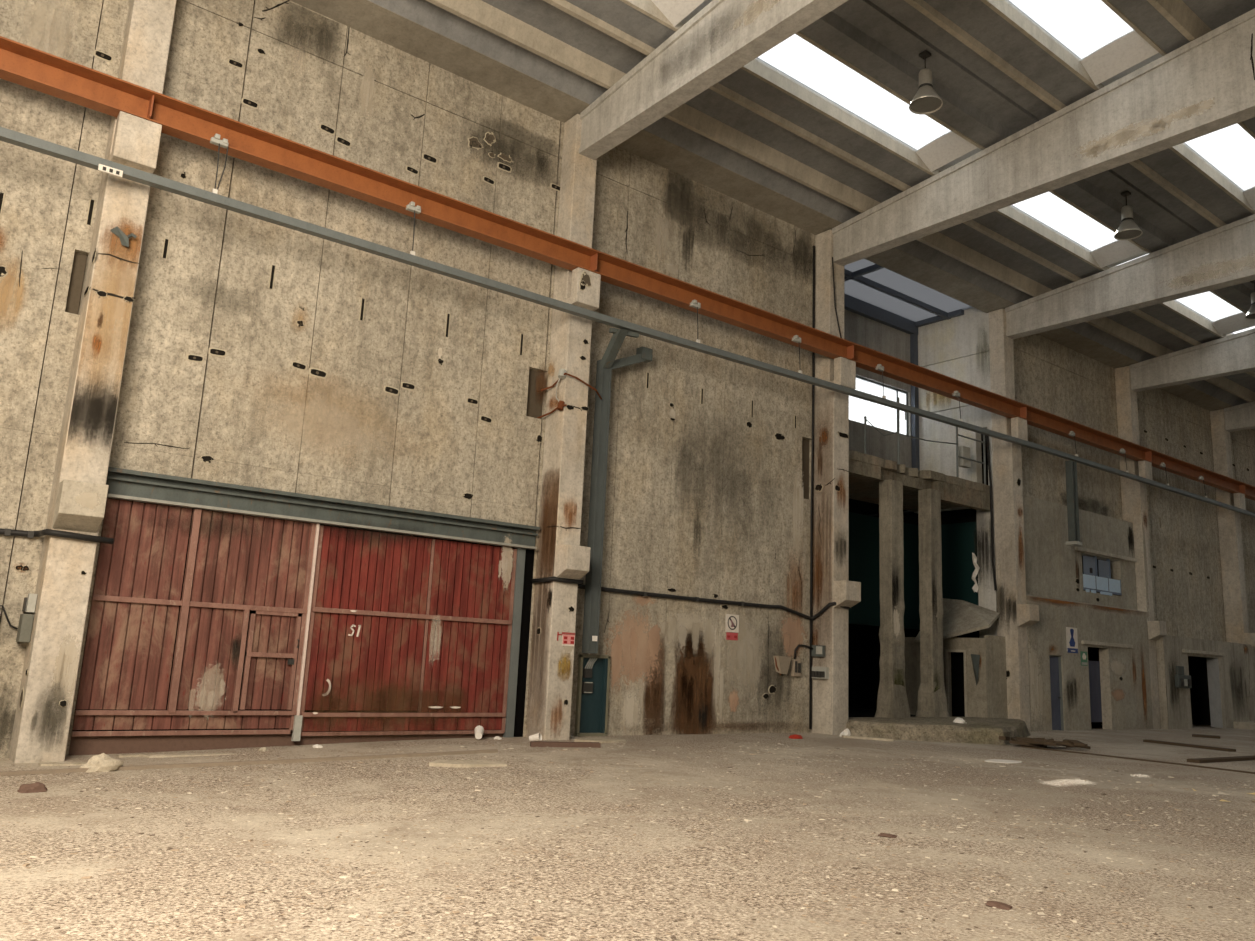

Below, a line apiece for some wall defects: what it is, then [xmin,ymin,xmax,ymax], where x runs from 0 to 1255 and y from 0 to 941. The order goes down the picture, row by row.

crack [98,253,139,264]
rust [109,224,143,262]
crack [92,289,135,302]
damp [71,399,117,437]
damp [644,633,715,735]
damp [42,693,62,726]